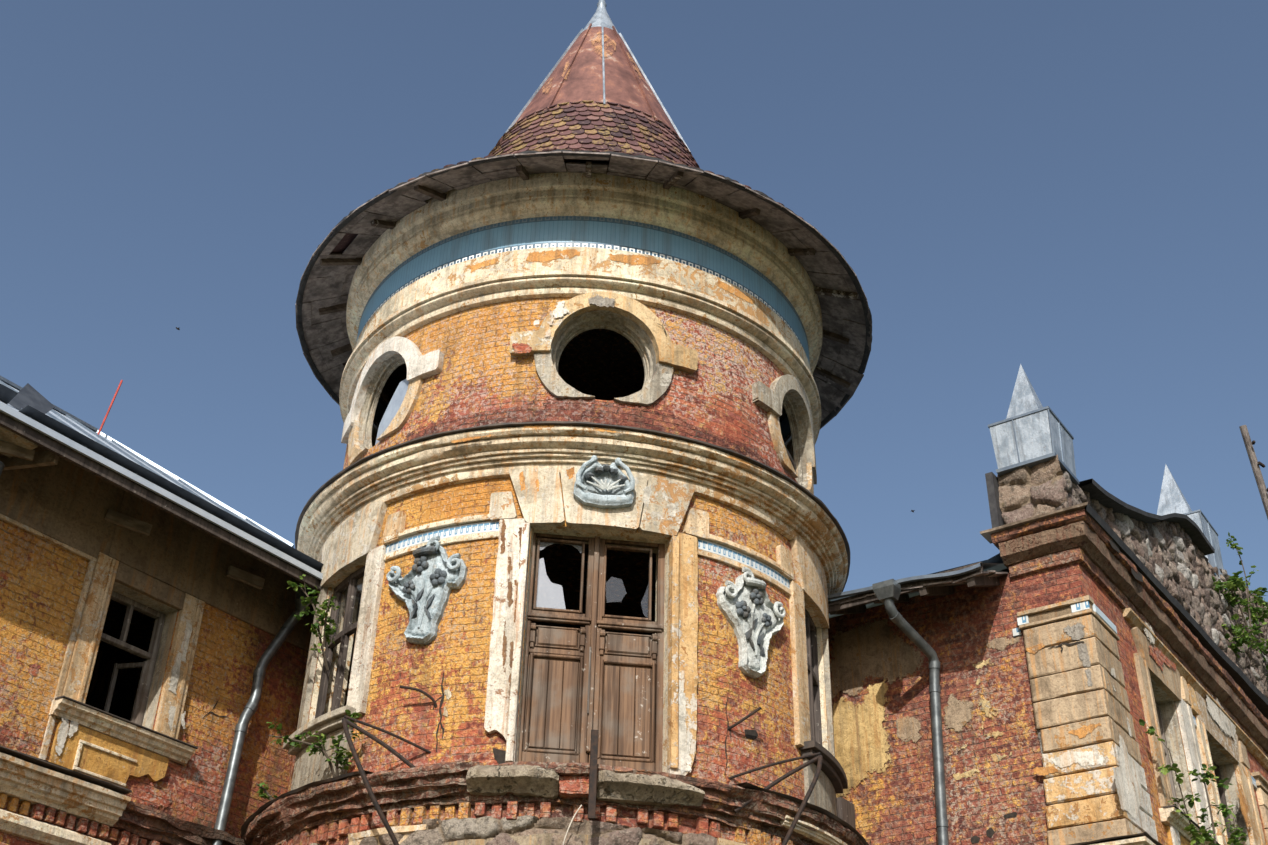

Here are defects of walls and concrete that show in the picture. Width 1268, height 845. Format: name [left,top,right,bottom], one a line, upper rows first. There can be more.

peeling [466,258,499,273]
peeling [526,249,580,263]
peeling [609,253,661,265]
flaking render [588,295,615,307]
peeling [718,281,754,304]
peeling [500,519,522,698]
flaking render [944,636,1045,762]
peeling [678,657,692,774]
peeling [55,717,79,755]
flaking render [953,769,980,780]
flaking render [110,744,247,845]